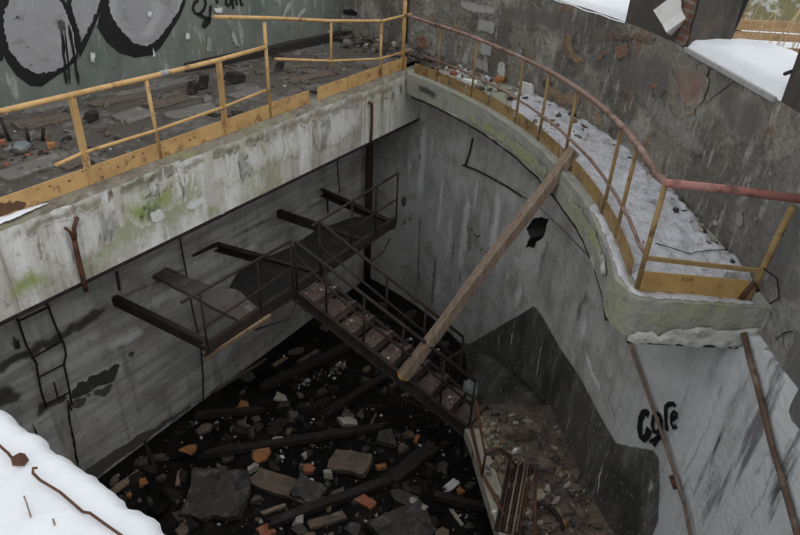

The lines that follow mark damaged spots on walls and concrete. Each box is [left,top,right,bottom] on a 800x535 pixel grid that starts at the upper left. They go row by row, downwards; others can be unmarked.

water stain [5,78,407,267]
rust [64,216,89,293]
peeling [514,217,549,274]
water stain [122,280,188,311]
water stain [0,303,111,409]
water stain [102,326,146,352]